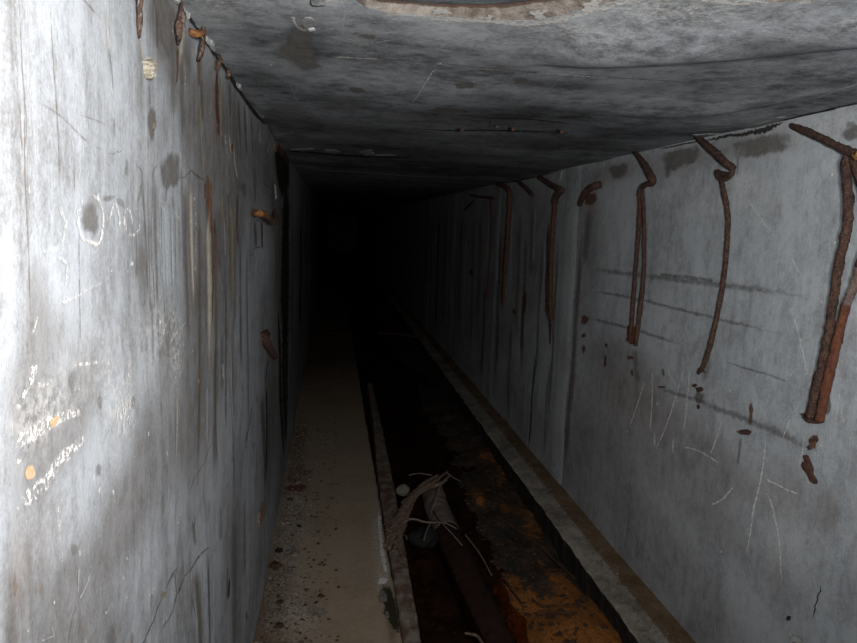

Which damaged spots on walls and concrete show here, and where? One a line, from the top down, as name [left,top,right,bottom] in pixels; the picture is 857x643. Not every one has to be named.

spalling [356,0,643,27]
damp [162,154,179,187]
corrosion [216,74,253,176]
spalling [173,0,411,225]
damp [84,205,98,232]
corrosion [188,178,239,357]
crack [143,549,206,643]